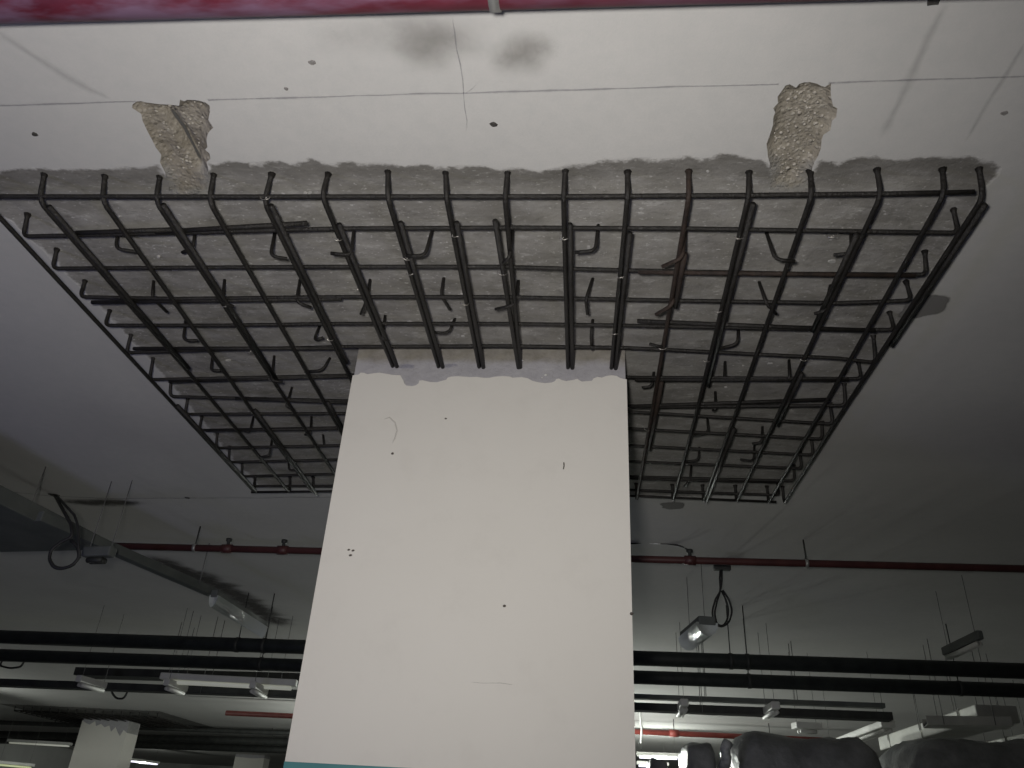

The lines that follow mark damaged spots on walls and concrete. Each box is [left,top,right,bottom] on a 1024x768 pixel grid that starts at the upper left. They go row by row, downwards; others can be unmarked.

spalling [0,82,1003,503]